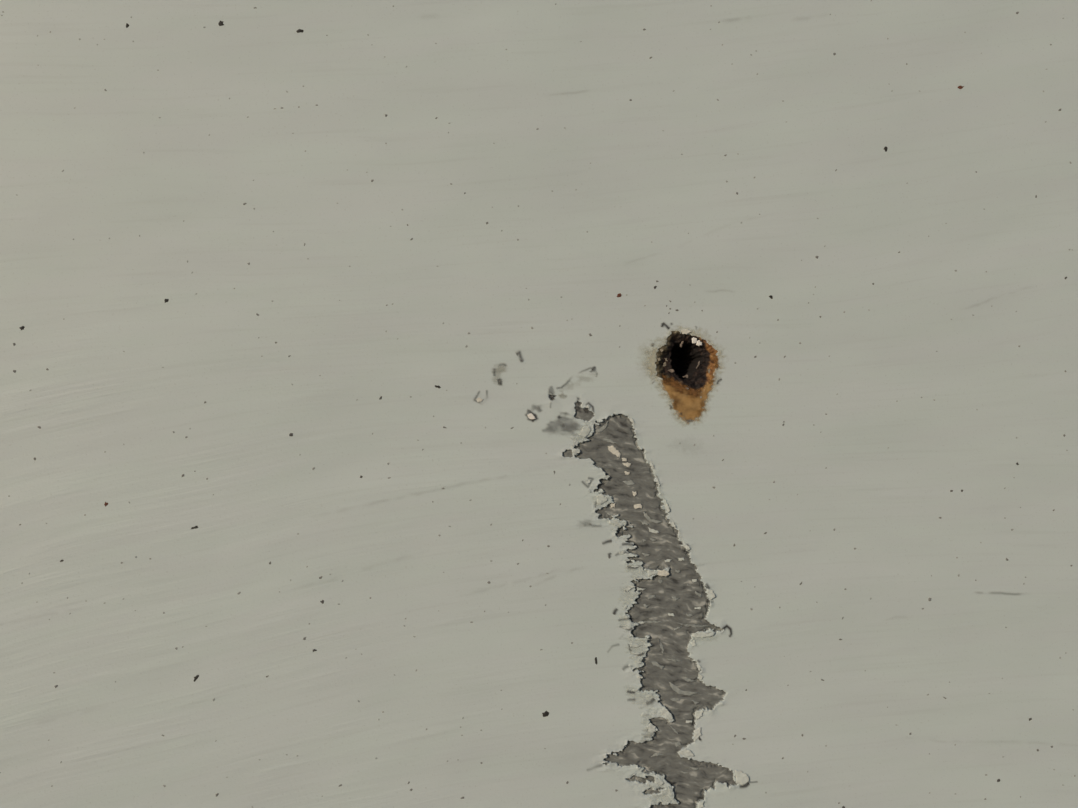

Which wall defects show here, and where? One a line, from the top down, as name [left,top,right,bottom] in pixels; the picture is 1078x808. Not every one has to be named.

corrosion [649,350,721,422]
peeling [563,401,749,808]